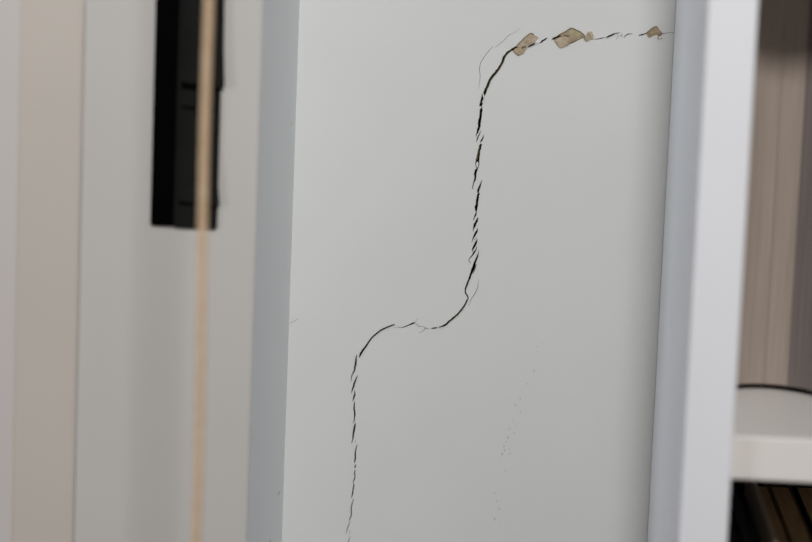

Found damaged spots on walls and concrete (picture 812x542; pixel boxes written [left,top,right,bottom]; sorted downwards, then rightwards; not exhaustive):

spalling [513,33,540,56]
spalling [554,28,594,48]
spalling [647,26,663,40]
crack [346,29,674,542]